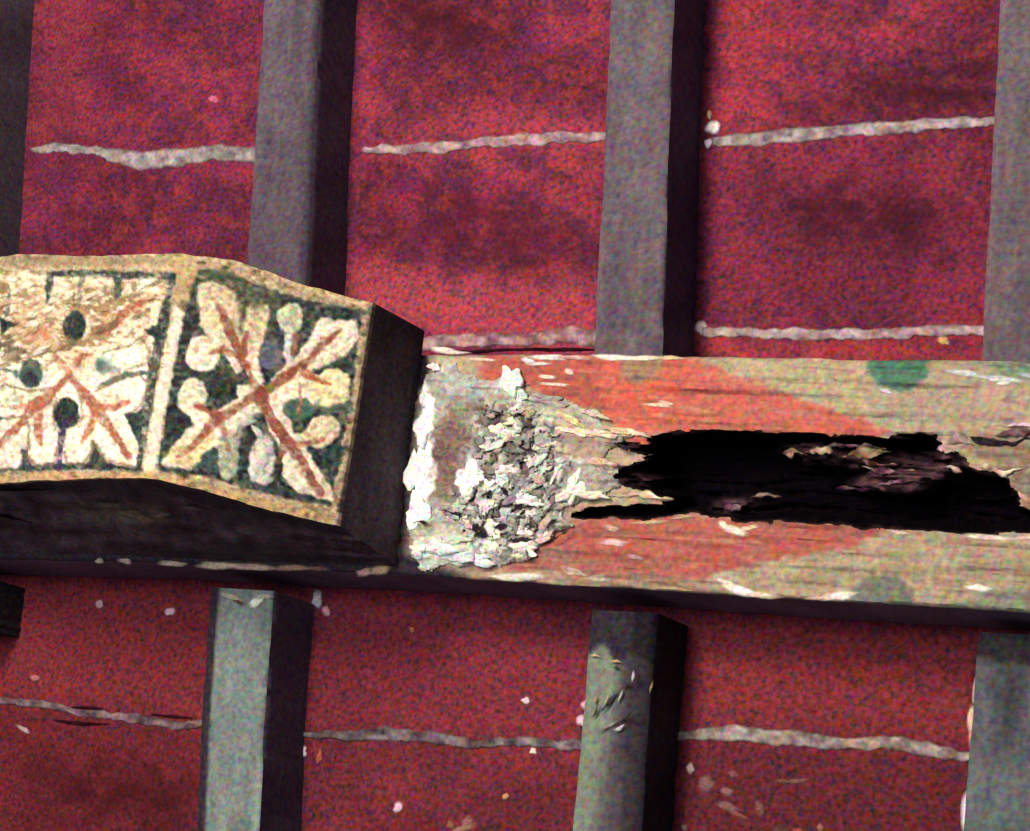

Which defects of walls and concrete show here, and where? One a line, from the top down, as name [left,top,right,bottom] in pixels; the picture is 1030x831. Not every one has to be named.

peeling [403,347,682,582]
crack [0,488,56,523]
peeling [633,515,694,524]
peeling [719,522,758,536]